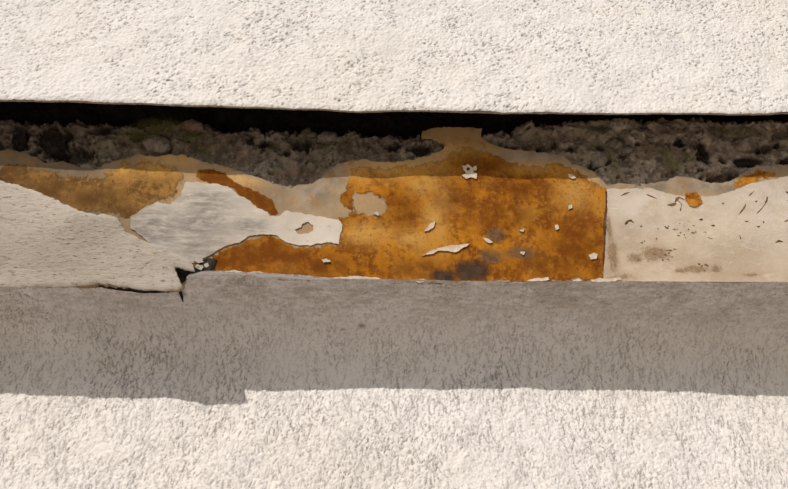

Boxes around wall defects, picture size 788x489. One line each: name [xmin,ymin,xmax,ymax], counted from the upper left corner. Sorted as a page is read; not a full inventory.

rust [733,170,776,189]
flaking render [0,101,788,292]
crack [96,285,184,302]